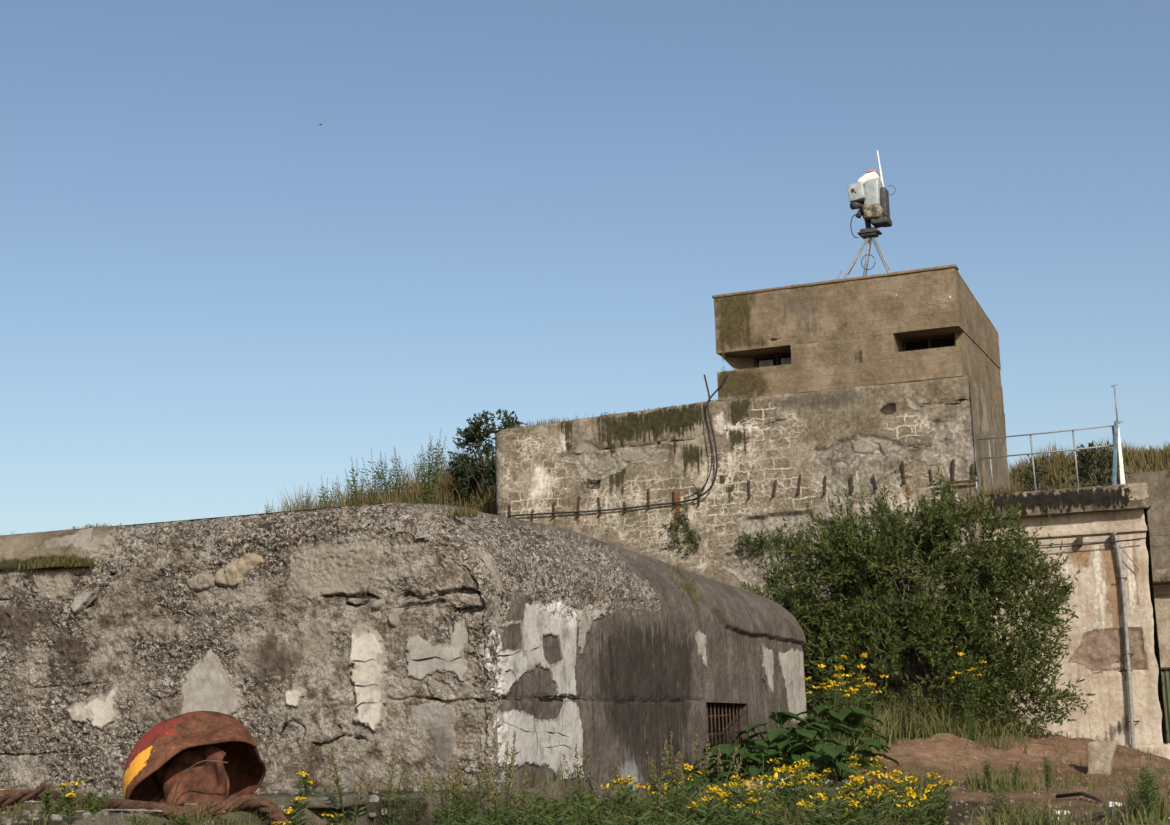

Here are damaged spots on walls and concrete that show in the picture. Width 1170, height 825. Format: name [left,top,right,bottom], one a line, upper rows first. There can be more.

damp [495,403,823,571]
flaking render [67,688,117,730]
flaking render [179,649,241,716]
flaking render [348,624,389,732]
flaking render [405,597,609,780]